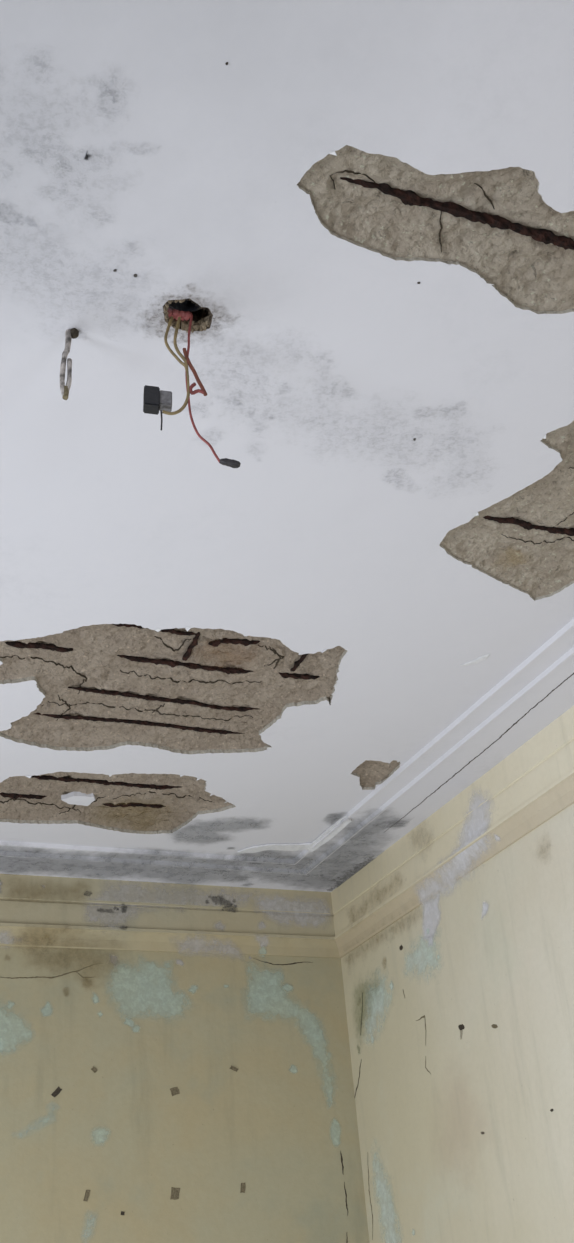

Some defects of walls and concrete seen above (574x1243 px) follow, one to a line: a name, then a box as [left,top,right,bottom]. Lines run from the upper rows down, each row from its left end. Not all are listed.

flaking render [297,145,574,314]
flaking render [439,421,574,601]
flaking render [0,623,347,754]
flaking render [0,772,236,834]
flaking render [351,760,400,790]
water stain [0,821,401,890]
crack [340,1151,373,1243]